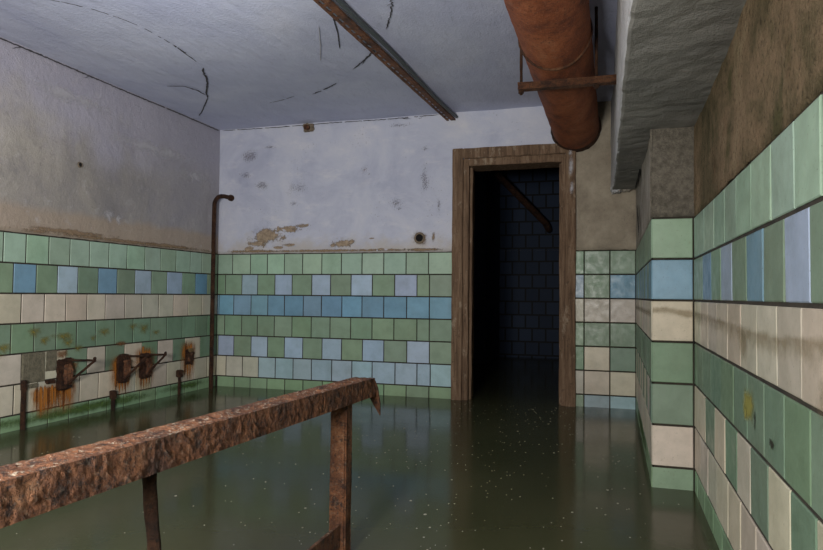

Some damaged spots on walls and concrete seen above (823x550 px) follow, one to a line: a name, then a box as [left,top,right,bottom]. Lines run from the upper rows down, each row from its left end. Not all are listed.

crack [0,0,434,131]
peeling [231,224,438,253]
rust [33,384,75,414]